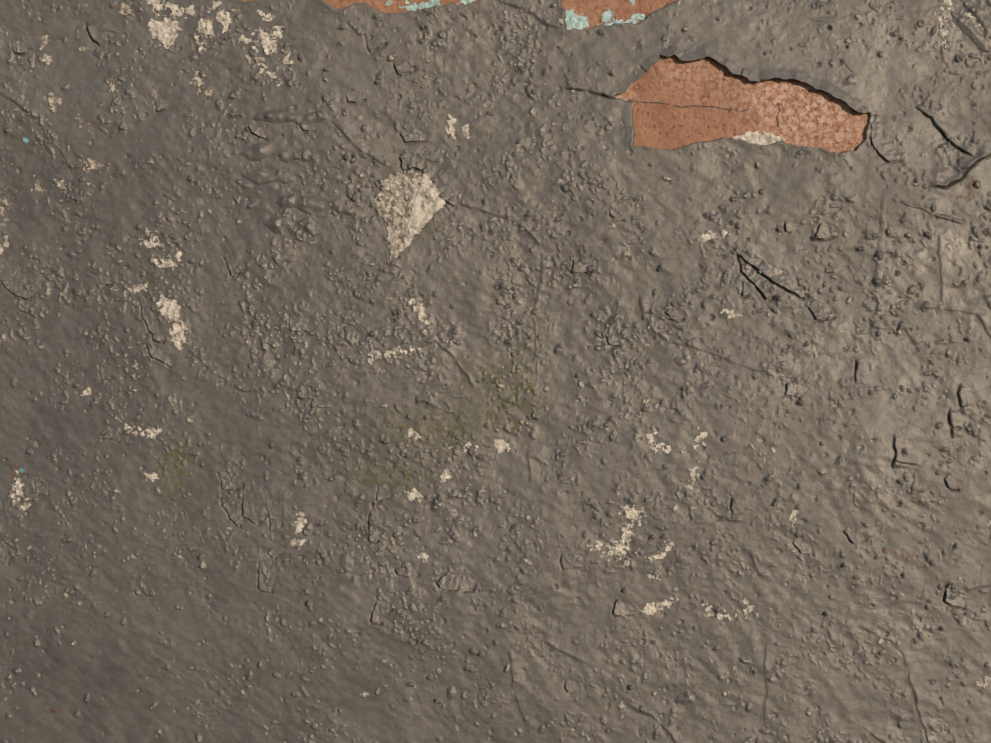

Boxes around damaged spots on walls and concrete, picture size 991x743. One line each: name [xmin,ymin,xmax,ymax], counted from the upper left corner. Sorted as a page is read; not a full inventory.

peeling [324,0,479,13]
peeling [562,0,677,31]
peeling [614,44,901,161]
crack [915,106,990,189]
flaking render [371,130,455,265]